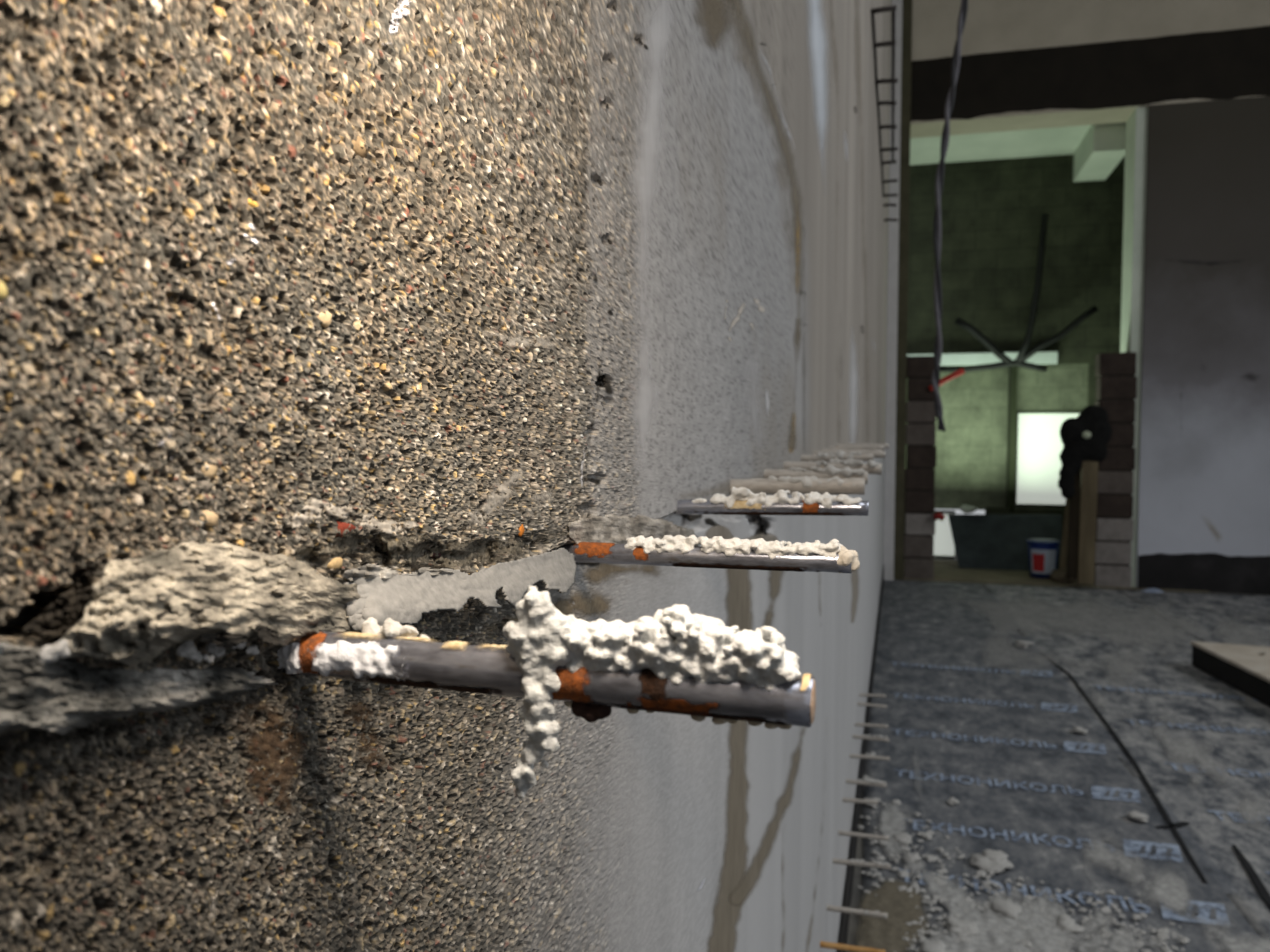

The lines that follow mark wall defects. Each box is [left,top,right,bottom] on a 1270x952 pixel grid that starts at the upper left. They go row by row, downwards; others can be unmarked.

crack [0,571,94,636]
spalling [38,593,84,640]
damp [727,569,783,632]
damp [708,720,800,952]